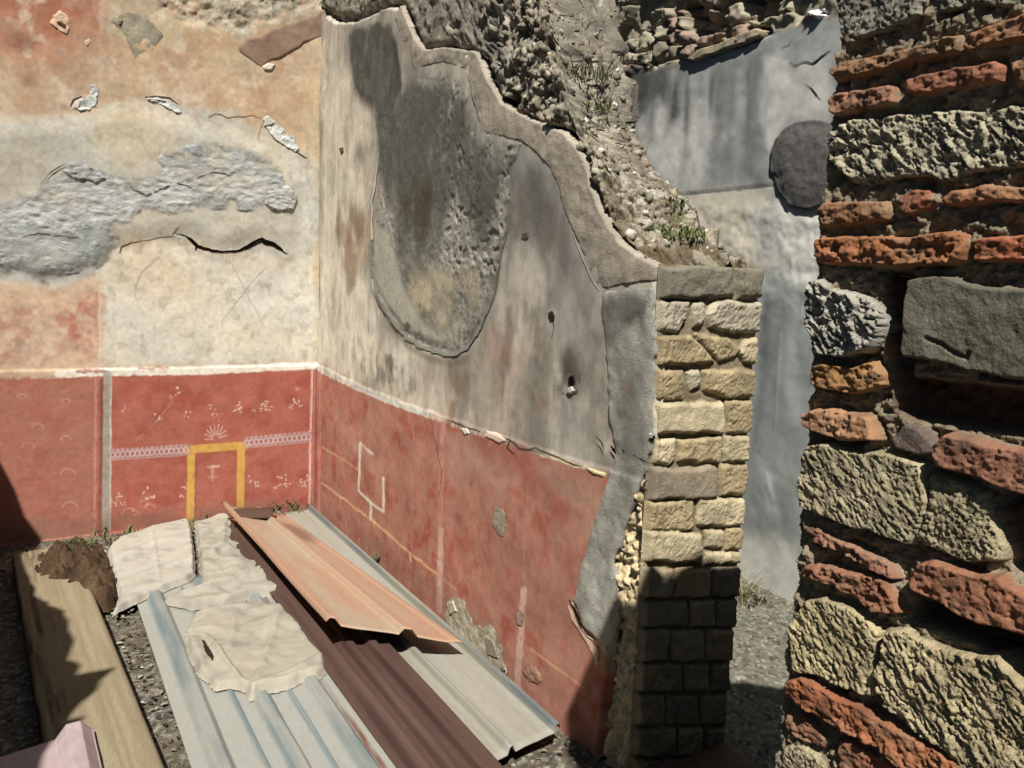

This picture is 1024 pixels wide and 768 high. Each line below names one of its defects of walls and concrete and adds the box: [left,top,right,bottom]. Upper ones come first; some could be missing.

flaking render [111,13,163,59]
flaking render [239,9,329,70]
flaking render [0,143,298,275]
flaking render [355,42,522,356]
crack [119,233,287,330]
crack [430,418,655,500]
flaking render [444,596,507,675]
flaking render [568,600,599,665]